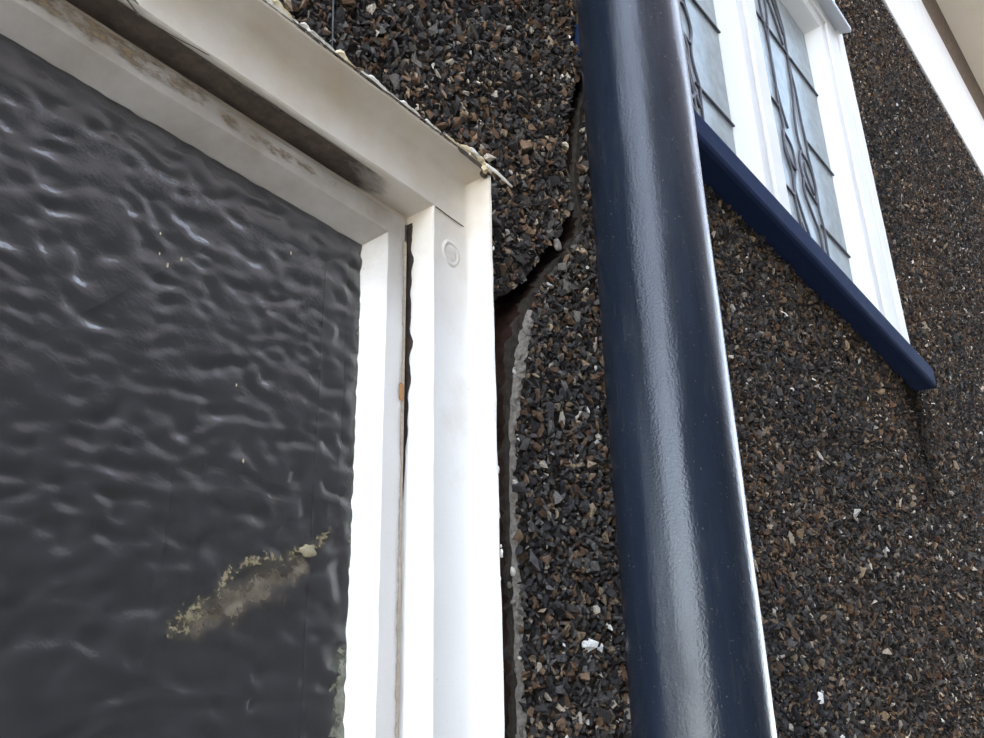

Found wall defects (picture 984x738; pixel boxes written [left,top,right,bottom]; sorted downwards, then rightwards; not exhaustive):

crack [494,80,582,307]
flaking render [498,310,534,738]